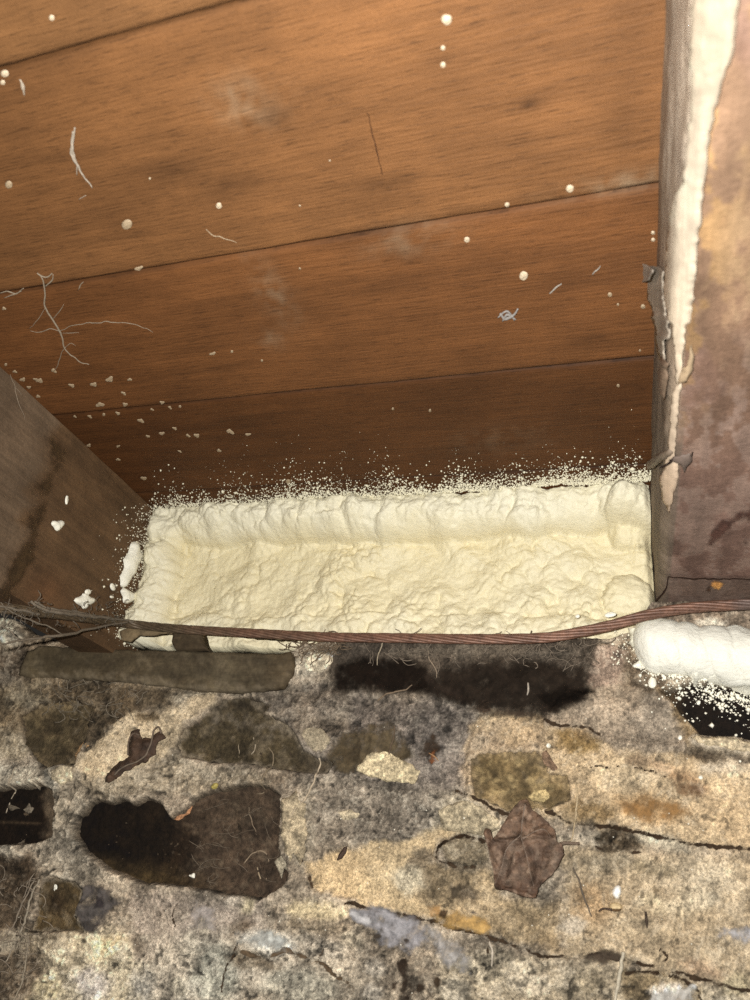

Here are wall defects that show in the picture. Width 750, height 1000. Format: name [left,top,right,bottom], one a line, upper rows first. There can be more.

peeling [642,0,740,513]